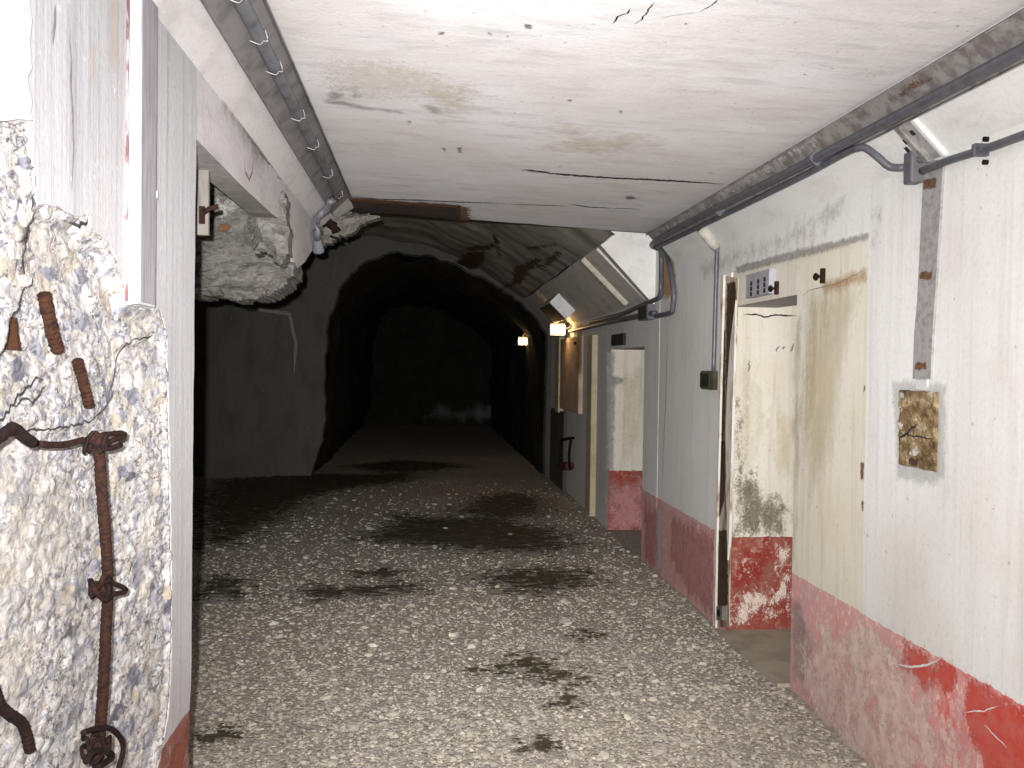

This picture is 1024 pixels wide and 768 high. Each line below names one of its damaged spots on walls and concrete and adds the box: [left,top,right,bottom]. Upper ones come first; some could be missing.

crack [521,169,725,185]
spalling [194,182,303,305]
spalling [319,211,381,248]
rust [455,233,502,269]
rust [498,242,562,293]
spalling [0,0,188,768]
mould [732,468,785,538]
peeling [730,542,792,626]